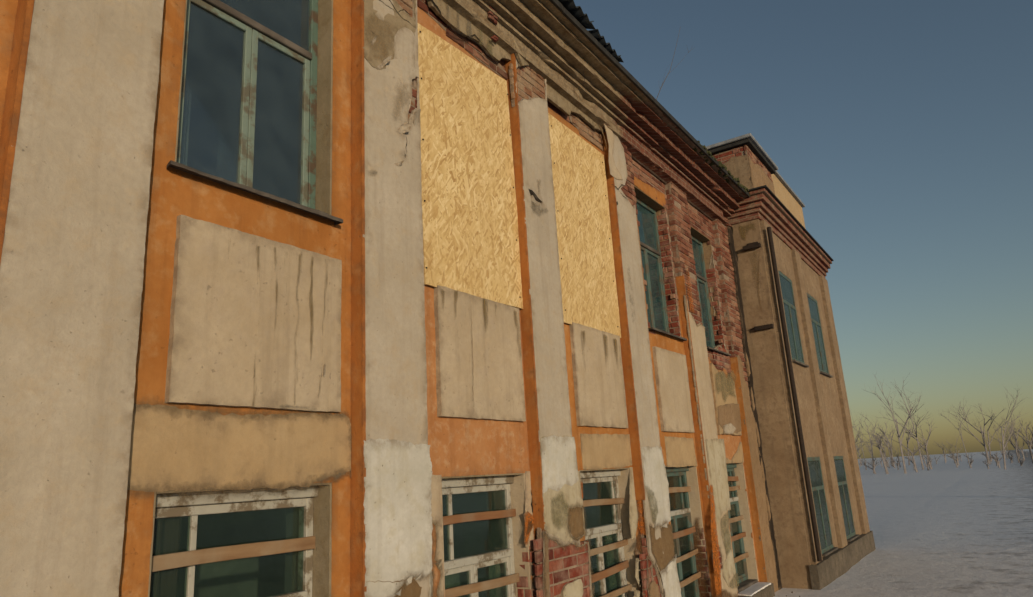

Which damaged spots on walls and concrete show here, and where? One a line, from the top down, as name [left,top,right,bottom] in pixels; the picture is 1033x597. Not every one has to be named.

crack [379,0,498,63]
spalling [399,0,547,107]
peeling [394,523,442,597]
spalling [517,505,594,597]
peeling [634,522,677,597]